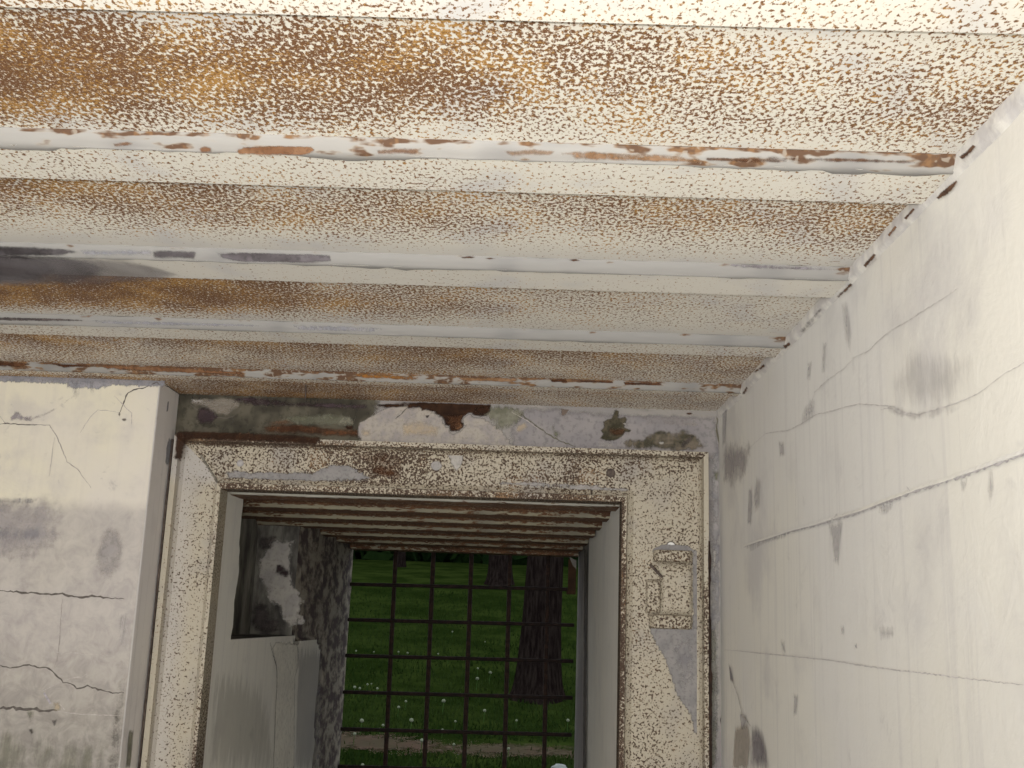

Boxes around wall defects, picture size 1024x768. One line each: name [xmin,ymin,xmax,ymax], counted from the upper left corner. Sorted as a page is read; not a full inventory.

rust [237,146,314,155]
rust [573,152,779,162]
rust [102,365,242,374]
crack [2,382,180,483]
rust [379,402,491,431]
spalling [358,405,718,471]
peeling [227,465,369,481]
crack [744,449,1024,547]
peeling [252,536,305,632]
crack [0,590,124,716]
peeling [650,544,697,733]
crack [731,650,1024,685]